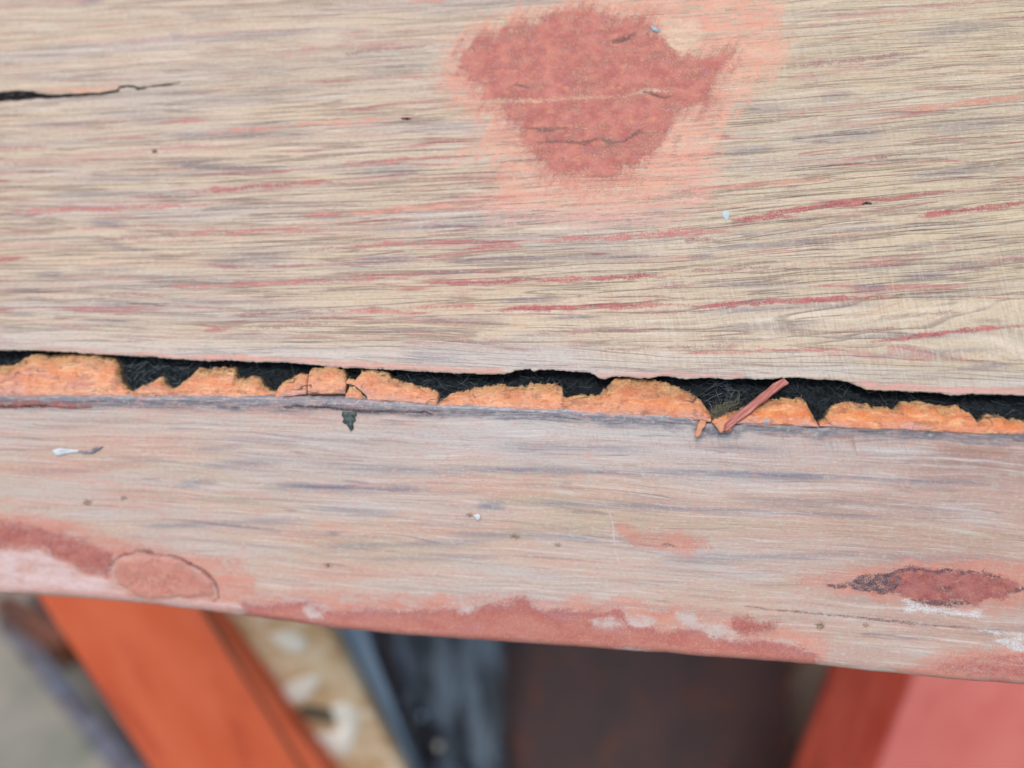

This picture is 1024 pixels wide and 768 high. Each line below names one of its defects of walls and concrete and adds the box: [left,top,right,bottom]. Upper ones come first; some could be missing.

crack [0,82,181,101]
peeling [95,201,525,252]
peeling [228,178,1024,330]
peeling [527,327,665,336]
crack [0,397,93,410]
crack [283,404,432,415]
peeling [0,509,832,665]
peeling [791,552,1024,684]